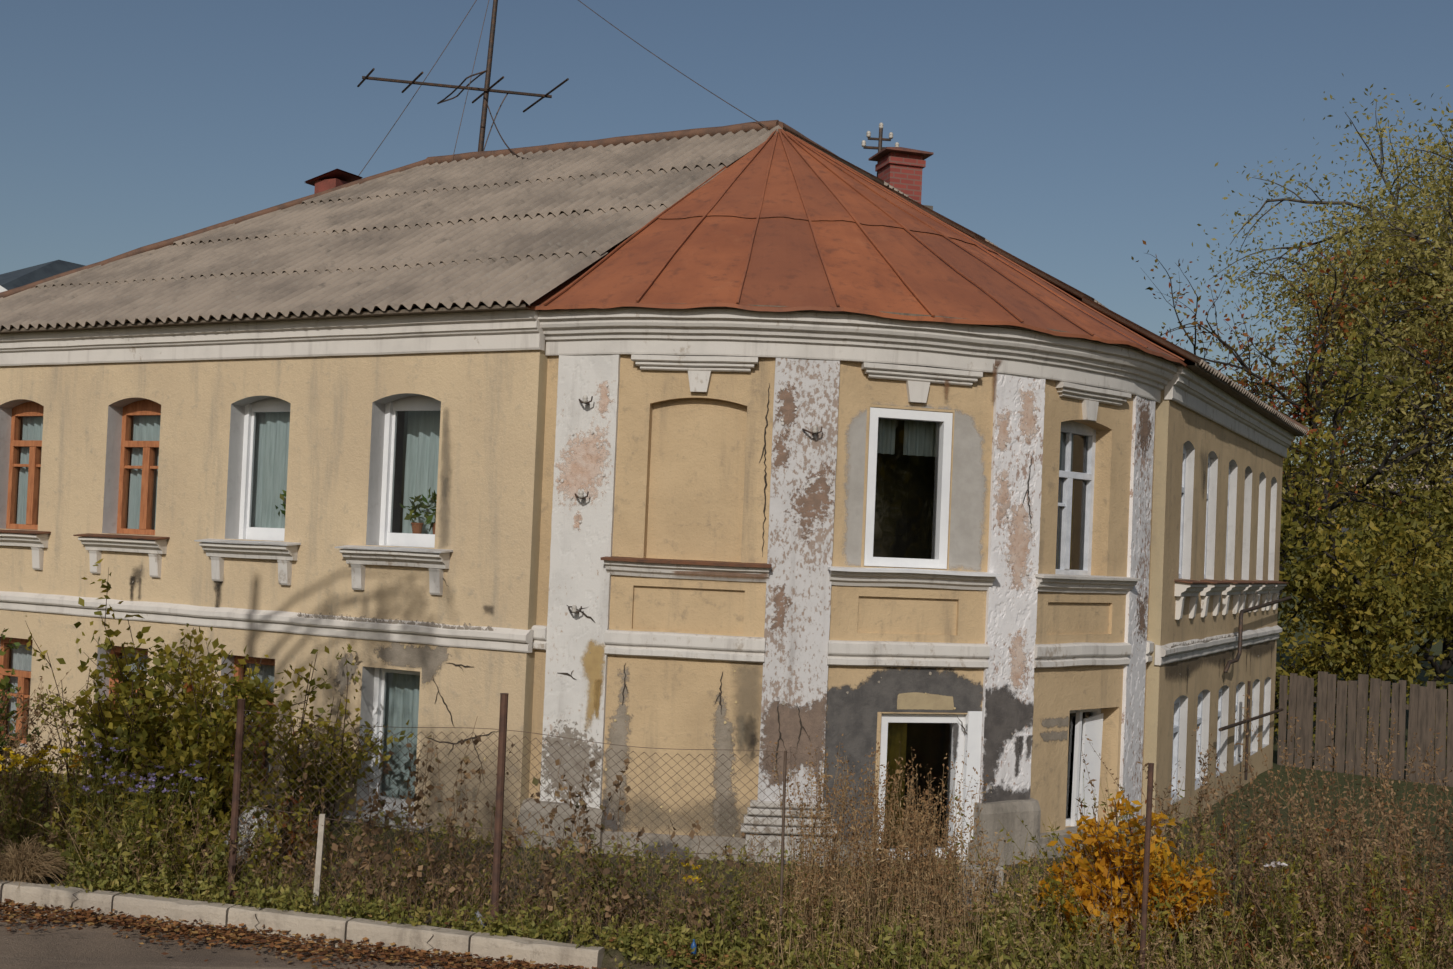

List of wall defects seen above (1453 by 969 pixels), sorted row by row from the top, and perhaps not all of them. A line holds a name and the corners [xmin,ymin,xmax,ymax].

peeling [553,381,613,530]
peeling [773,384,798,468]
peeling [785,456,836,544]
peeling [993,385,1039,593]
flaking render [298,612,493,696]
peeling [770,584,793,636]
flaking render [759,694,827,789]
flaking render [982,629,1034,803]